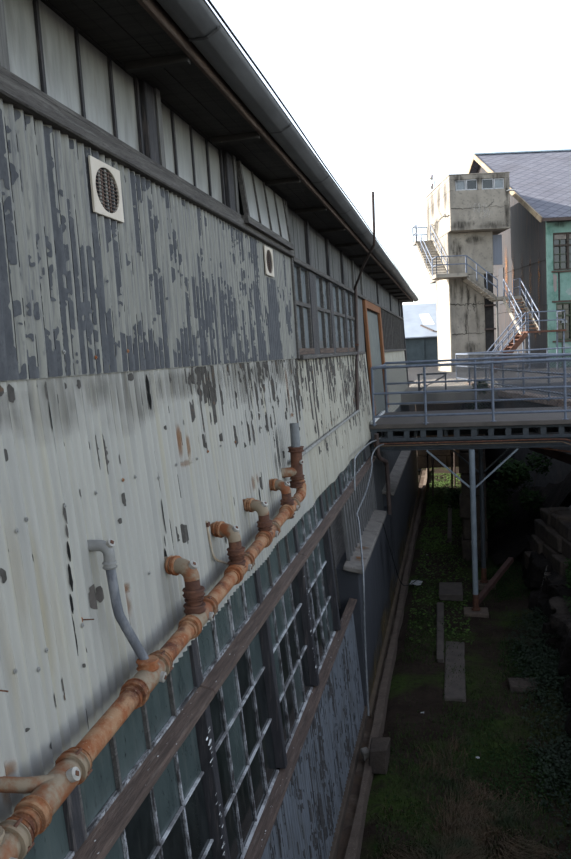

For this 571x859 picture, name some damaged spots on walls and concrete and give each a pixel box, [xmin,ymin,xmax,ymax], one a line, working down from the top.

peeling [0,109,370,458]
peeling [89,584,104,609]
peeling [169,520,189,549]
peeling [265,635,362,859]